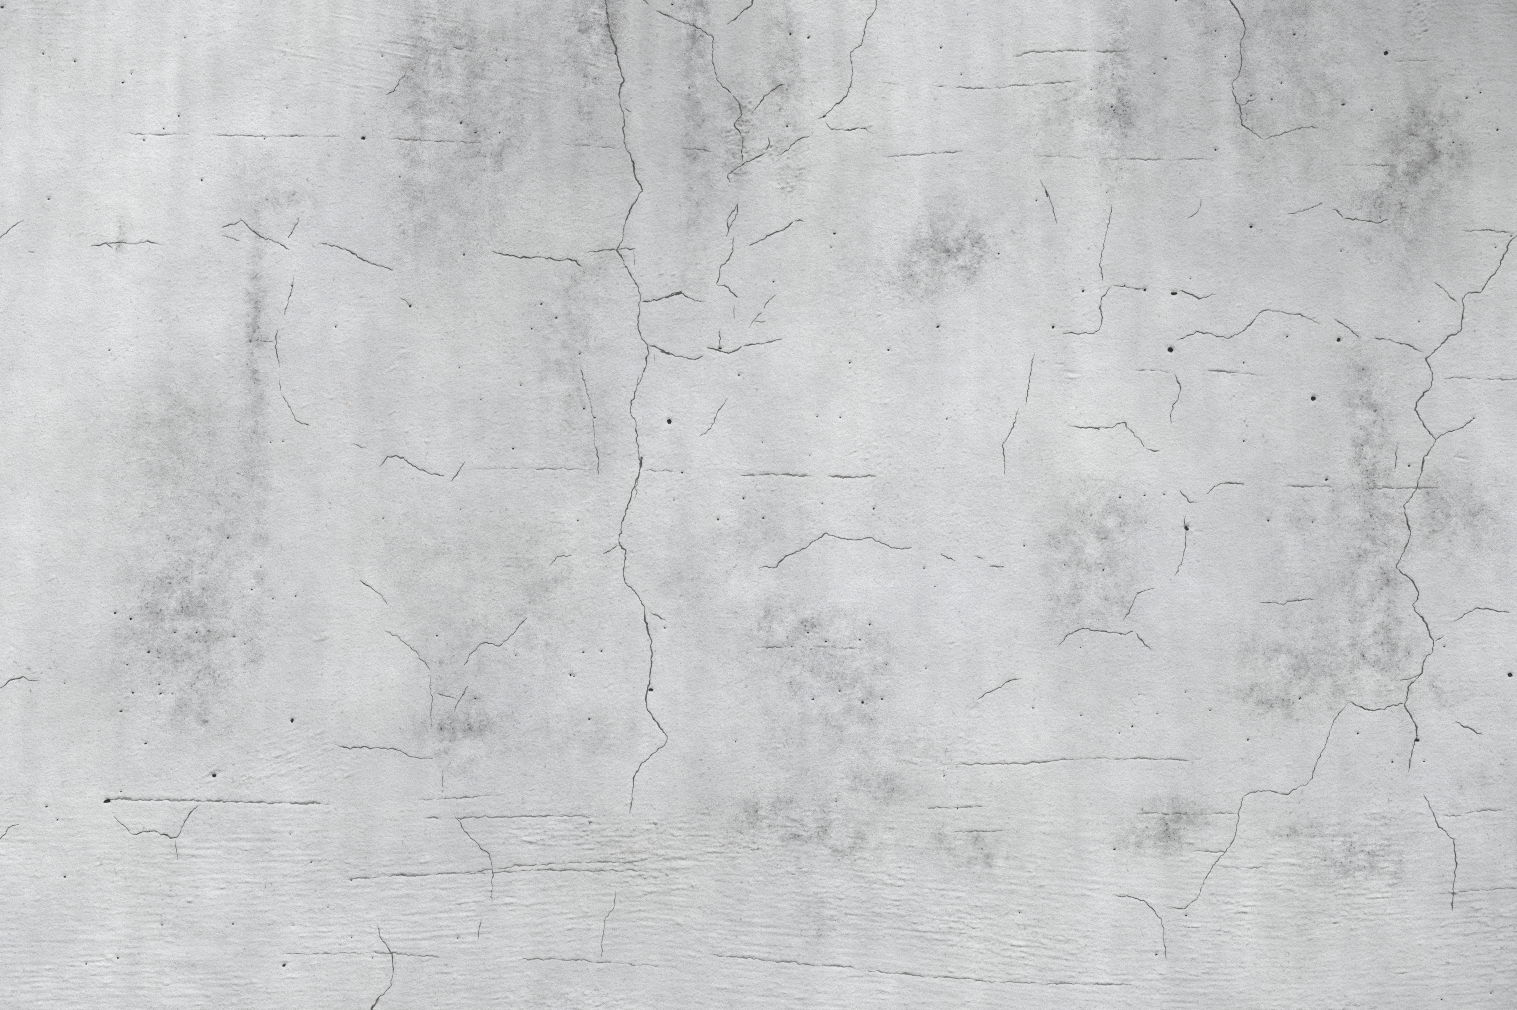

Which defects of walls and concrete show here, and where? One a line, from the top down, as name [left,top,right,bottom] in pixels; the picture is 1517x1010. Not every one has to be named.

crack [1230,0,1318,139]
crack [1063,206,1143,334]
crack [1288,202,1387,223]
crack [493,0,877,809]
crack [760,533,1004,568]
crack [1060,229,1517,956]
crack [116,805,200,859]